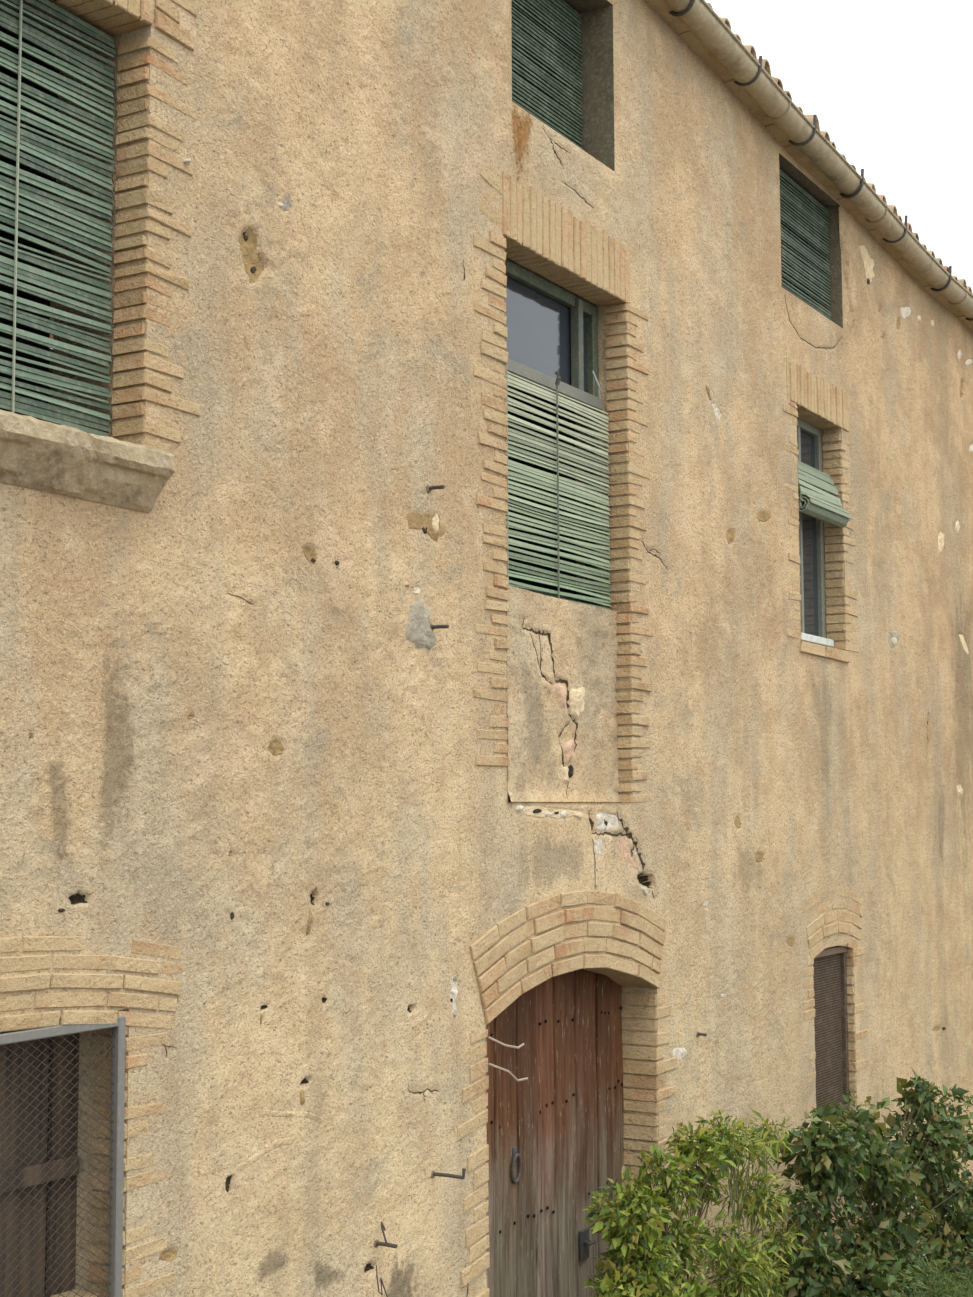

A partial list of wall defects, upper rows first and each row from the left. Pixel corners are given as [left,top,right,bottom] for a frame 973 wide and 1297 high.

rust [512,110,533,168]
flaking render [238,227,264,283]
flaking render [859,245,875,285]
crack [522,618,578,794]
crack [589,811,654,897]
spalling [58,893,88,912]
leakage [388,1264,412,1297]